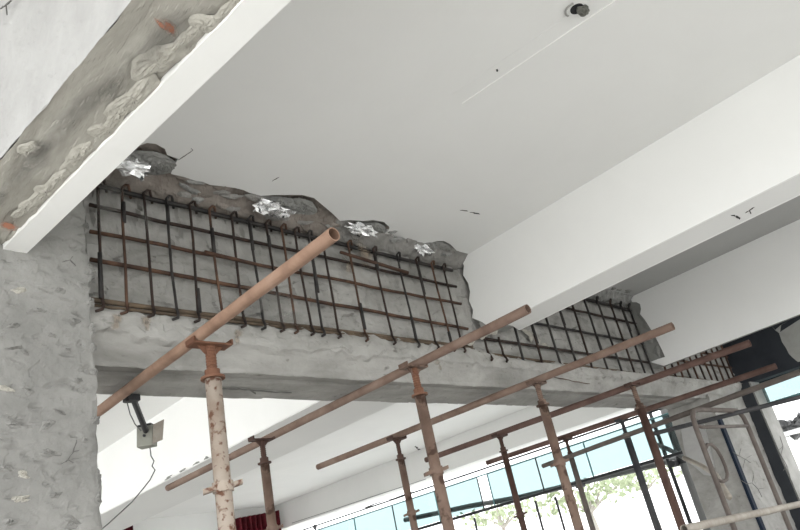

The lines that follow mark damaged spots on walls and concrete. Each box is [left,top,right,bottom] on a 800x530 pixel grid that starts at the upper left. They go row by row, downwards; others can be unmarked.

spalling [77,143,734,381]